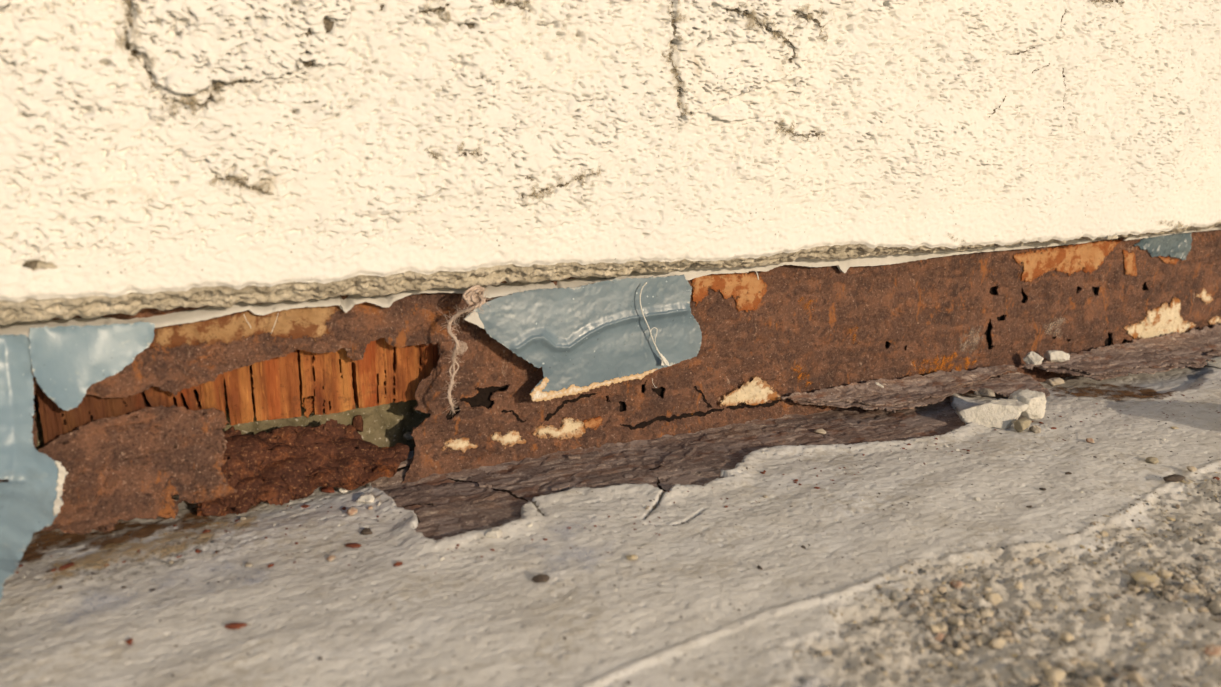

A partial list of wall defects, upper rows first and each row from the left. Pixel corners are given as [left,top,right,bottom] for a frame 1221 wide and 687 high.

crack [117,0,262,115]
crack [662,0,692,116]
crack [726,5,828,58]
crack [210,172,269,194]
spalling [1117,222,1221,239]
rust [912,352,977,376]
rust [1052,383,1172,401]
peeling [0,237,1100,601]